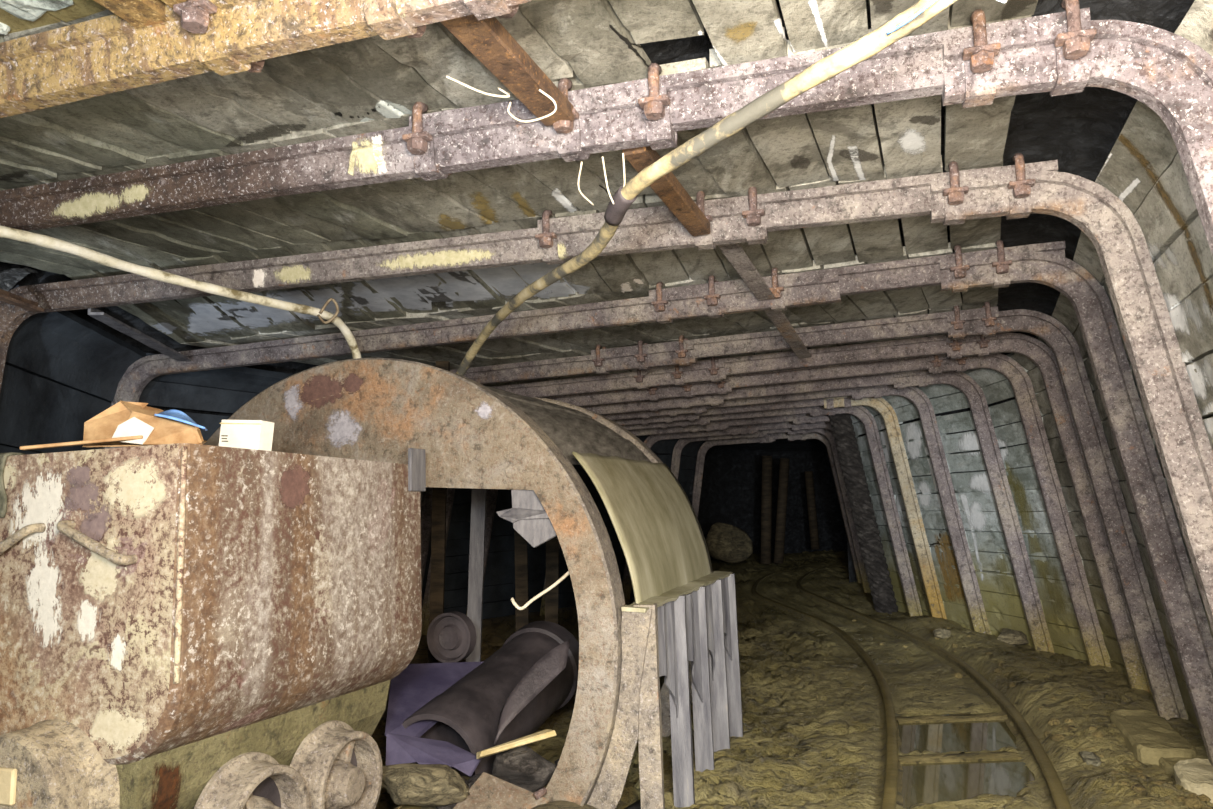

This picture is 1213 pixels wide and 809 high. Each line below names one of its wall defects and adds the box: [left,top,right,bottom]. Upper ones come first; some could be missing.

water stain [1119,178,1140,202]
water stain [1163,293,1213,334]
water stain [1181,351,1213,437]